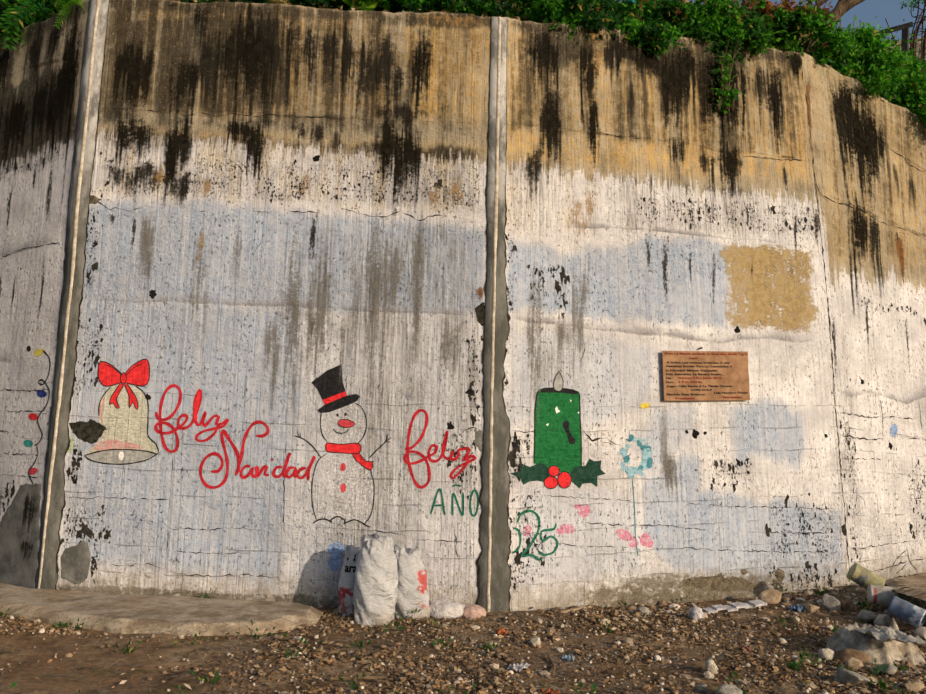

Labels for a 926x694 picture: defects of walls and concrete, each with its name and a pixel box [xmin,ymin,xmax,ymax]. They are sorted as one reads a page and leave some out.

damp [0,18,82,214]
damp [111,3,433,213]
damp [520,29,802,197]
damp [712,213,819,331]
damp [831,81,885,344]
damp [893,165,916,200]